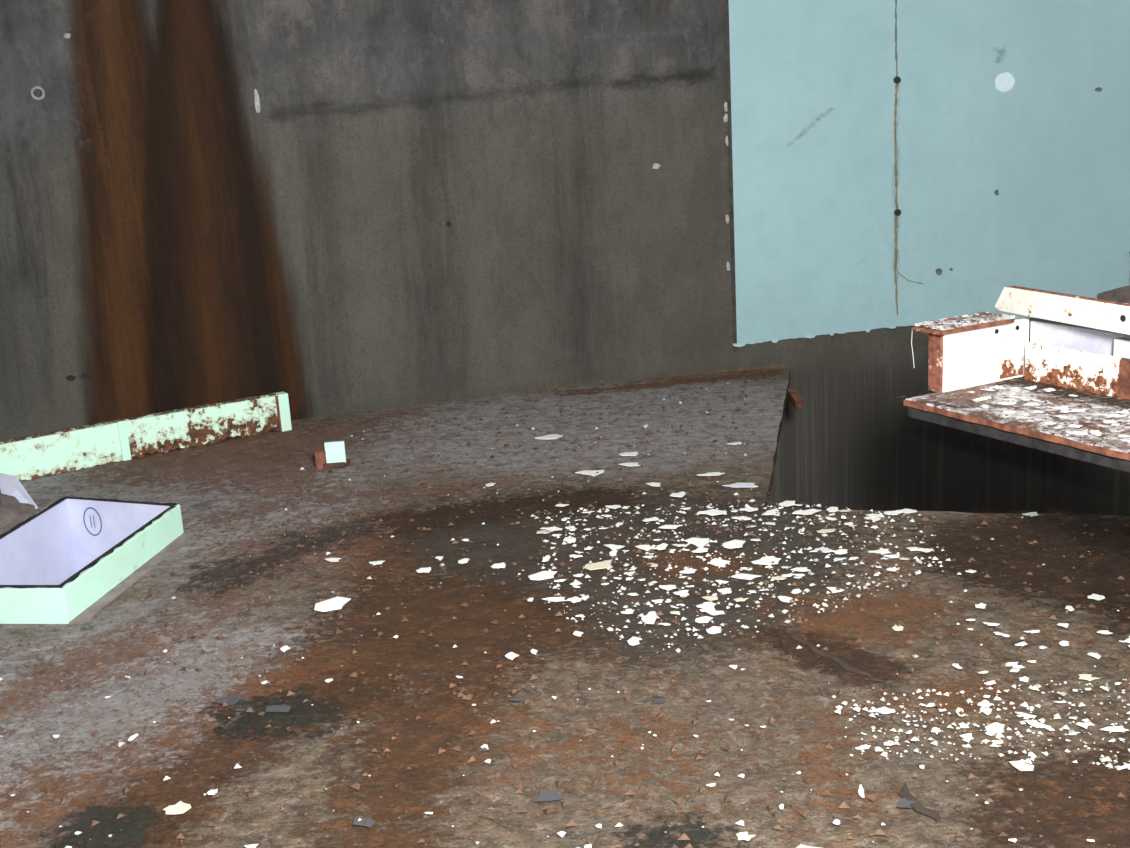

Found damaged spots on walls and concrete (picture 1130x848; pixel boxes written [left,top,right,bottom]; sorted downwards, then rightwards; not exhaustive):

crack [894,0,923,315]
corrosion [0,0,901,848]
corrosion [742,575,1032,732]
corrosion [904,507,1130,651]
corrosion [946,731,1130,848]